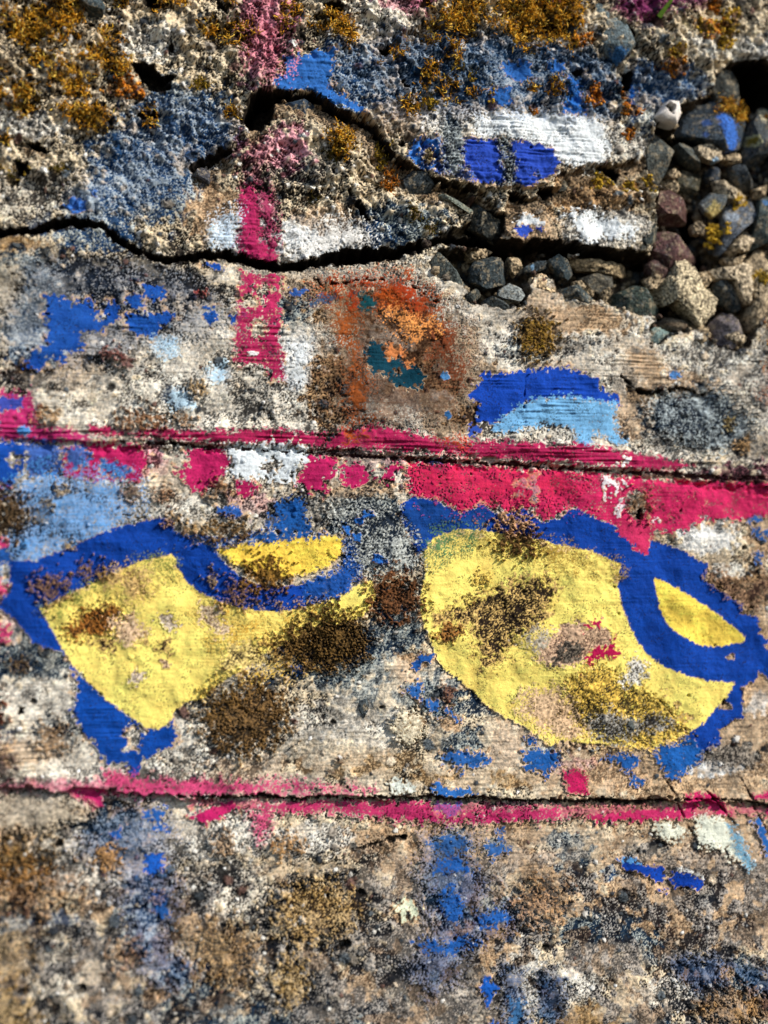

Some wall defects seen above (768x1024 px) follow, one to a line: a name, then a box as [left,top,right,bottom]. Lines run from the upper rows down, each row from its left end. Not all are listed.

peeling [486,85,515,108]
peeling [546,59,583,77]
spalling [620,71,640,105]
spalling [680,59,768,125]
crack [0,88,647,286]
hole [508,186,552,204]
spalling [597,168,620,182]
spalling [648,123,768,290]
spalling [430,204,589,308]
spalling [632,305,768,352]
crack [176,780,768,834]
crack [351,835,407,852]